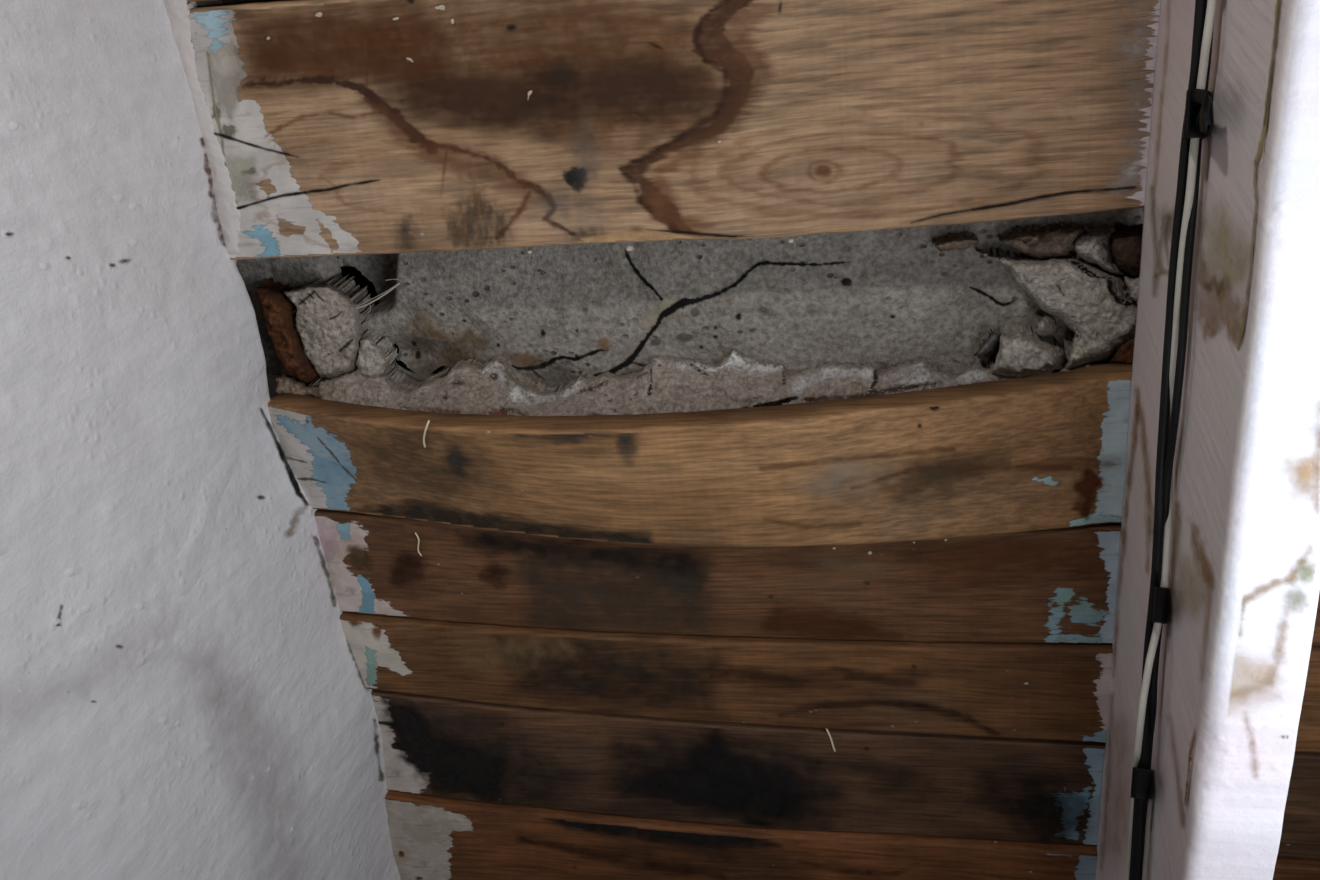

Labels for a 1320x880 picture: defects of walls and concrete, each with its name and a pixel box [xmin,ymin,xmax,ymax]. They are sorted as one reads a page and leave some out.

peeling [189,10,362,258]
crack [201,133,380,246]
damp [244,0,766,247]
crack [400,230,849,415]
spalling [318,298,1016,416]
crack [869,369,878,391]
peeling [269,407,474,880]
damp [370,502,704,621]
peeling [1022,380,1131,880]
damp [1242,559,1315,613]
damp [383,698,550,801]
damp [545,728,838,859]